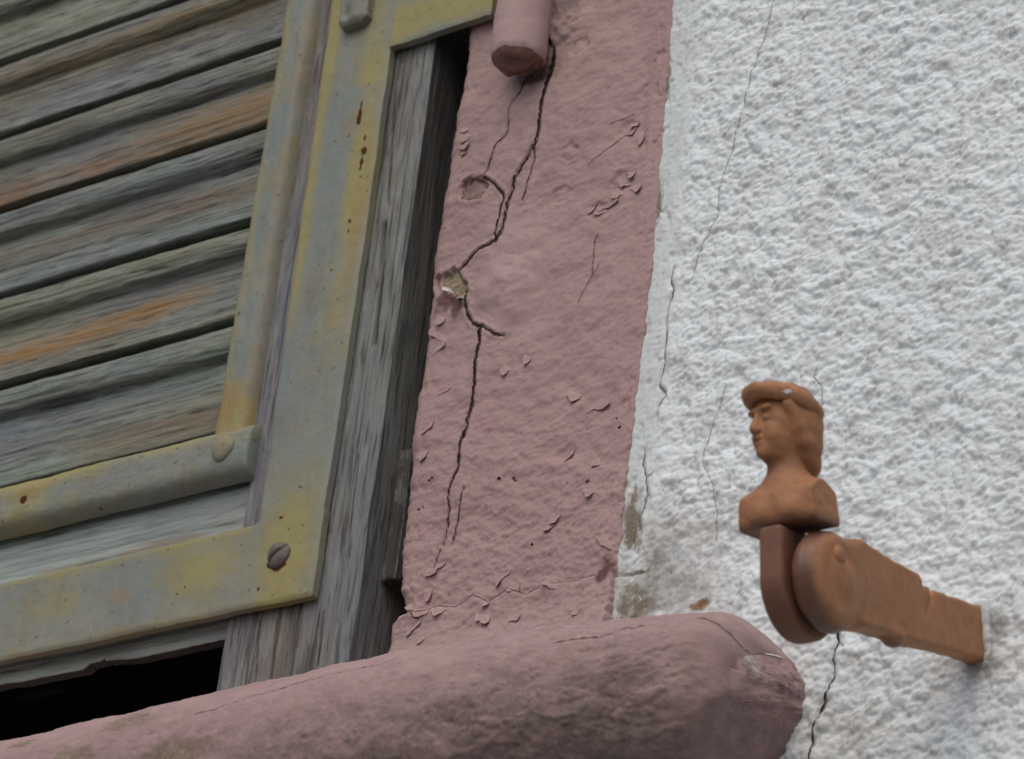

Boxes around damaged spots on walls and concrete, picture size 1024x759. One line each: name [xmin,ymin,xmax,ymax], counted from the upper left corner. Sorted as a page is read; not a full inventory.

spalling [461,176,488,200]
spalling [442,271,469,299]
crack [433,34,555,569]
peeling [428,315,447,353]
peeling [404,589,447,644]
crack [409,569,608,619]
crack [808,633,843,759]